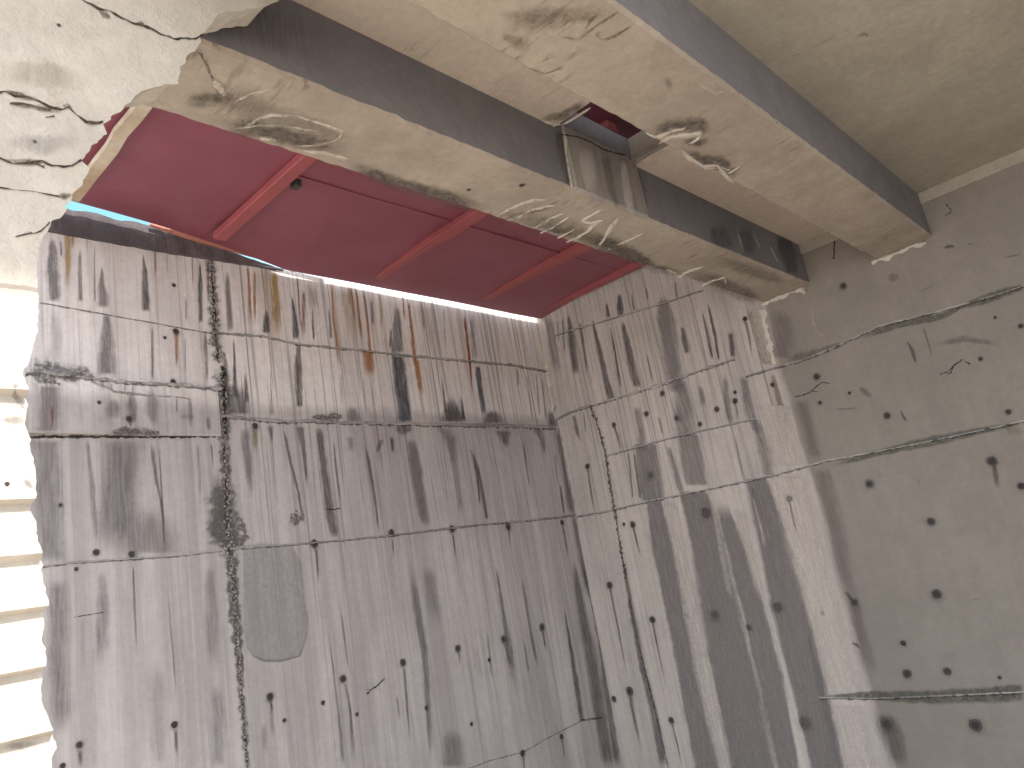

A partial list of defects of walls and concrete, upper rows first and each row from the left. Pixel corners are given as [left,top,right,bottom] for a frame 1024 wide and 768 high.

crack [83,0,202,41]
crack [0,91,104,125]
damp [235,113,347,159]
crack [0,157,82,199]
crack [15,221,50,237]
rust [247,269,256,312]
rust [270,276,280,322]
rust [351,290,372,371]
rust [402,297,423,388]
rust [464,319,472,383]
crack [589,405,669,768]